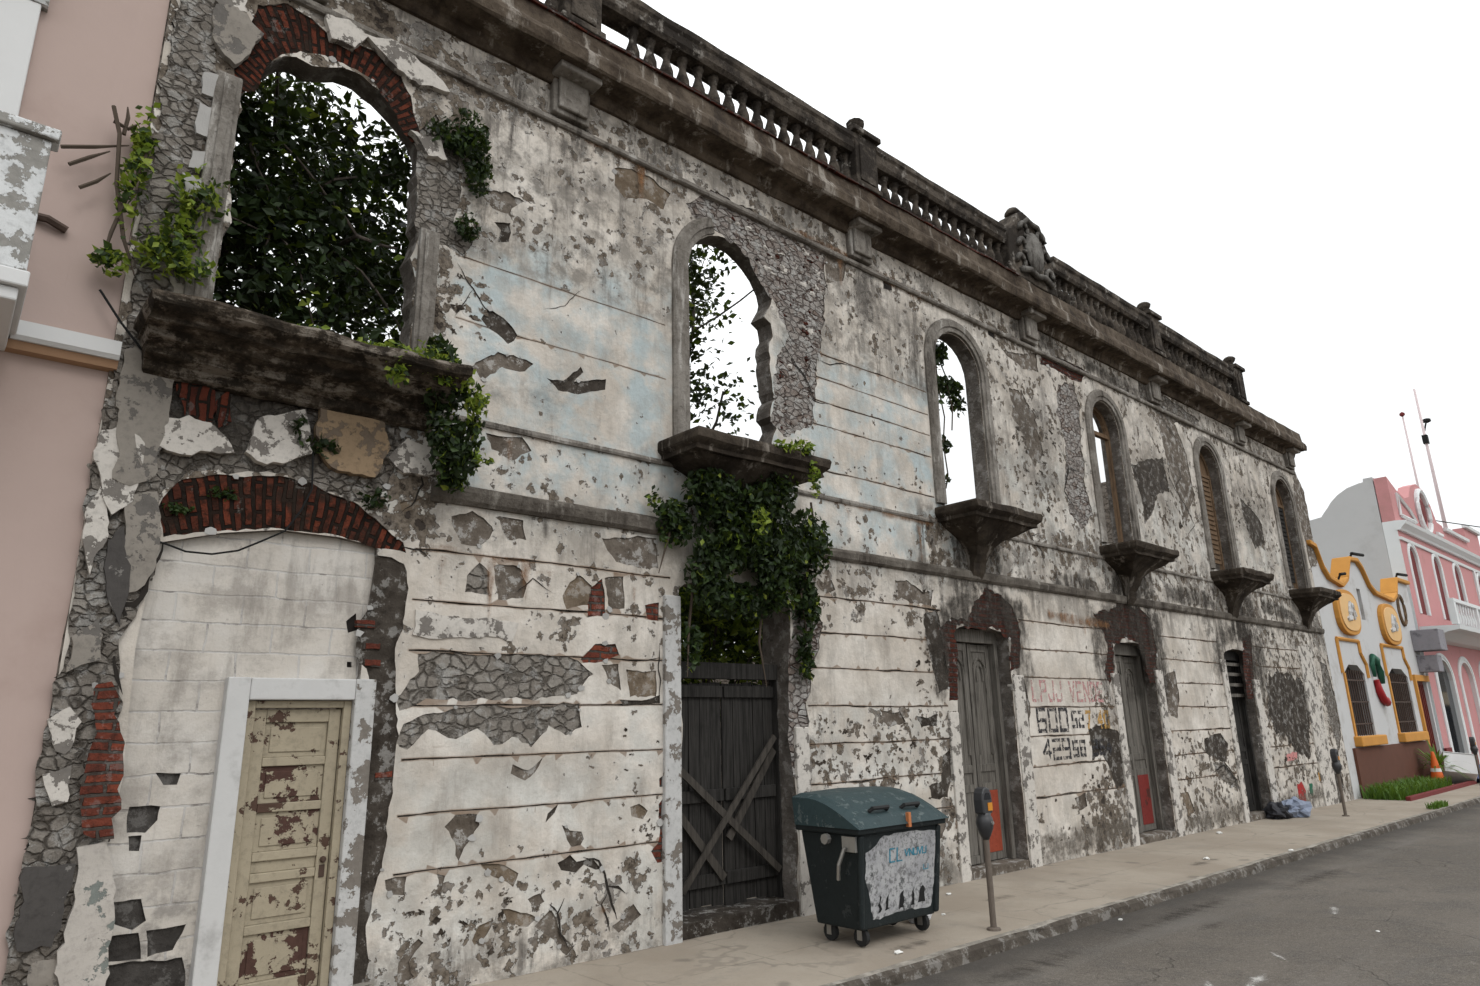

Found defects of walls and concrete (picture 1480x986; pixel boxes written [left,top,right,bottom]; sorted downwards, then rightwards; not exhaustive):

spalling [612,168,670,209]
flaking render [687,190,846,437]
flaking render [158,382,406,503]
flaking render [355,605,381,667]
spalling [563,535,658,621]
leakage [1055,571,1213,709]
spalling [79,672,125,840]
spalling [389,640,659,780]